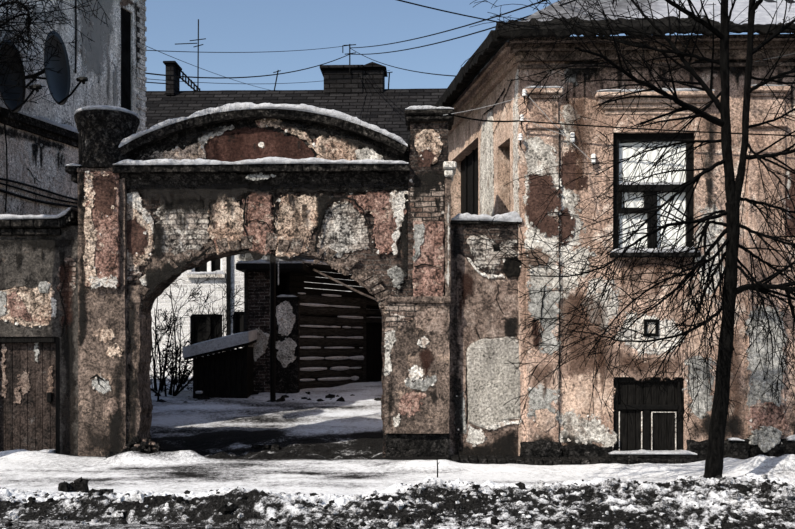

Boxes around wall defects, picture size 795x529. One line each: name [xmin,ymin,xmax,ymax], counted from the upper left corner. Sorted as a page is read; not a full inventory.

flaking render [4,144,67,214]
spalling [140,118,384,181]
flaking render [414,129,443,167]
flaking render [0,171,445,328]
flaking render [451,69,726,419]
spalling [97,326,124,357]
flaking render [248,301,297,368]
flaking render [384,302,448,376]
peeling [0,344,30,404]
spalling [92,375,111,394]
flaking render [393,365,437,427]
spalling [454,384,617,447]